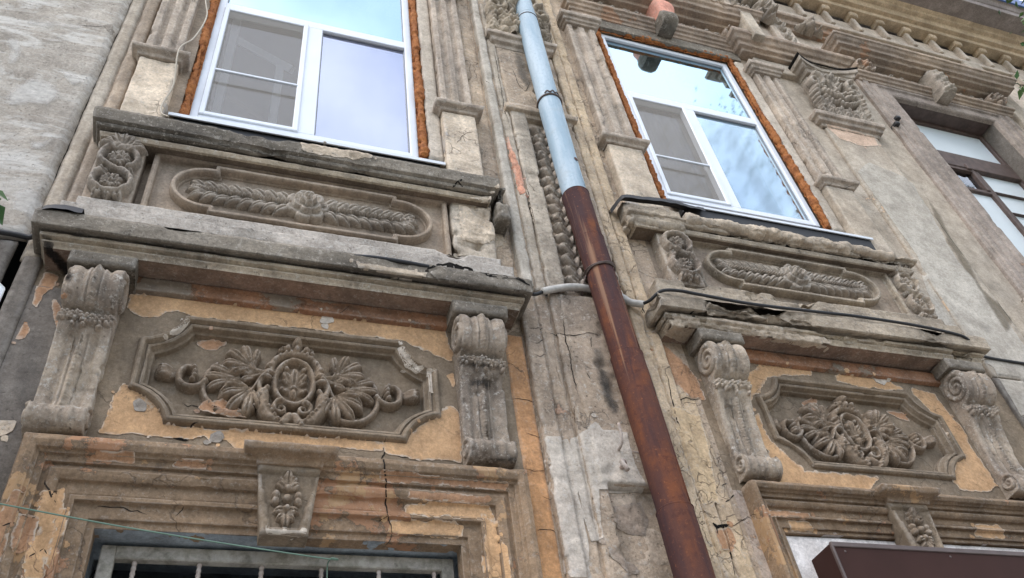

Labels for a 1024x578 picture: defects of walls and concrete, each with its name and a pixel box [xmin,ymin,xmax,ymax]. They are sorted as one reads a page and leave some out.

flaking render [301,141,377,160]
flaking render [506,137,529,198]
peeling [127,293,455,393]
crack [535,321,599,393]
crack [665,367,698,425]
peeling [747,362,879,489]
peeling [835,368,999,492]
peeling [0,485,70,578]
crack [379,438,406,545]
flaking render [596,494,649,536]
crack [713,484,744,574]